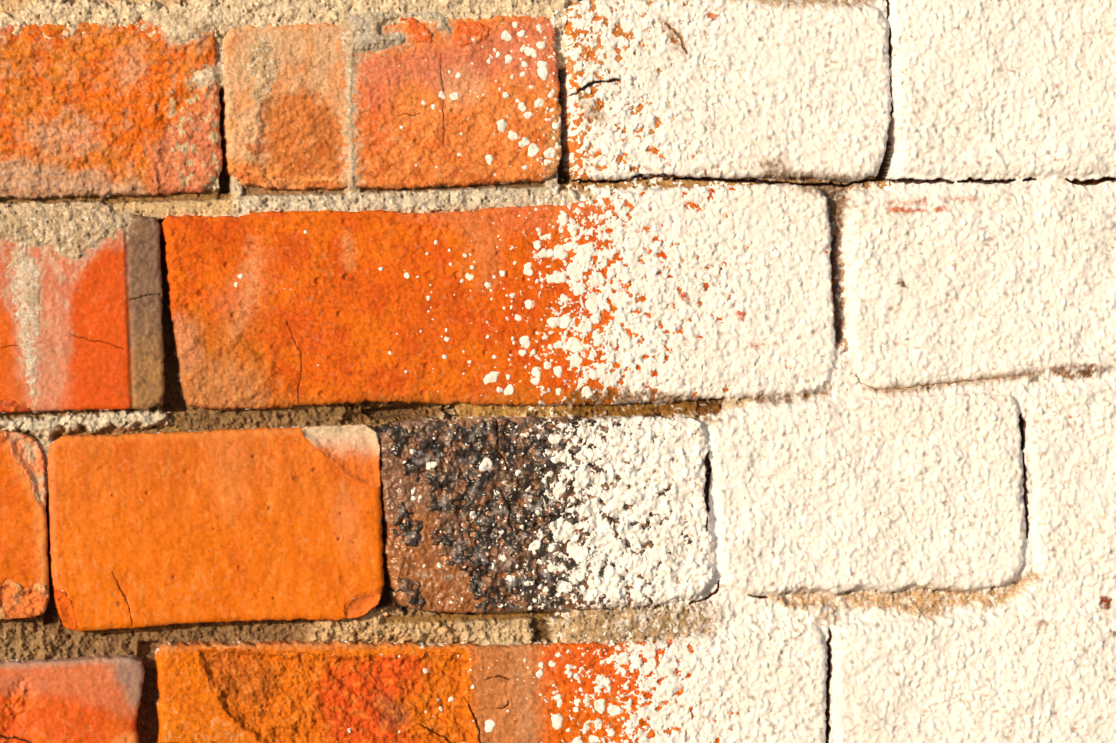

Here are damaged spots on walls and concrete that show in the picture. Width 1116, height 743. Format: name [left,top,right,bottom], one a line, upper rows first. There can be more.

crack [703,452,711,531]
crack [1019,414,1029,538]
crack [824,629,832,743]